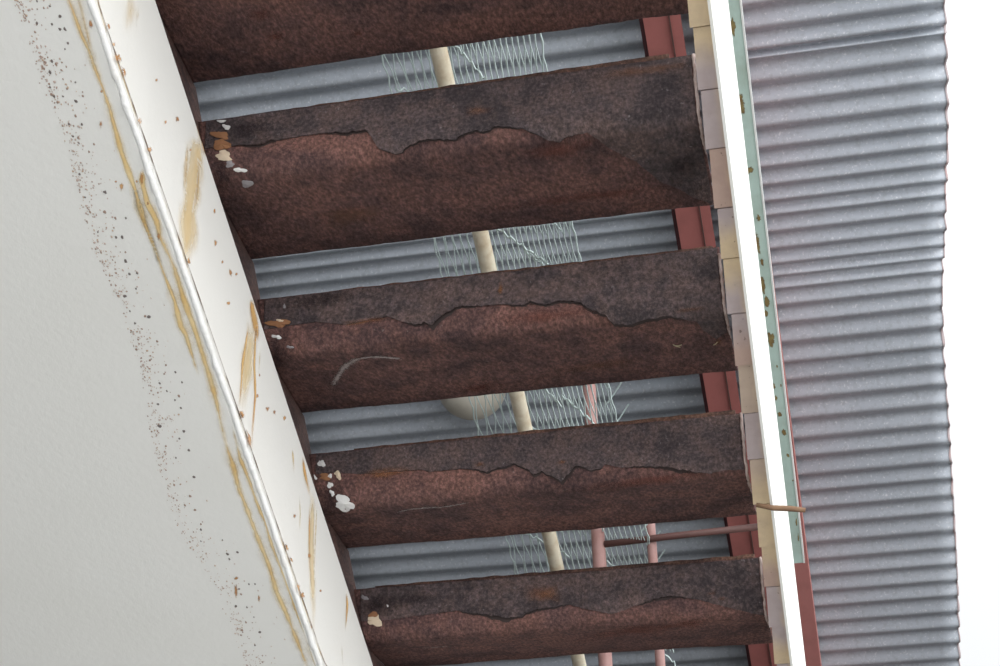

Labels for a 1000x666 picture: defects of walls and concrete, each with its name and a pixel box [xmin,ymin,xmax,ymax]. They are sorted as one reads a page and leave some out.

corrosion [70,3,168,253]
corrosion [183,144,205,249]
peeling [210,120,254,188]
corrosion [755,234,770,317]
leakage [14,0,275,666]
corrosion [160,264,219,412]
corrosion [241,302,286,422]
peeling [314,460,355,512]
corrosion [228,451,305,660]
corrosion [308,508,321,592]
peeling [368,605,388,627]